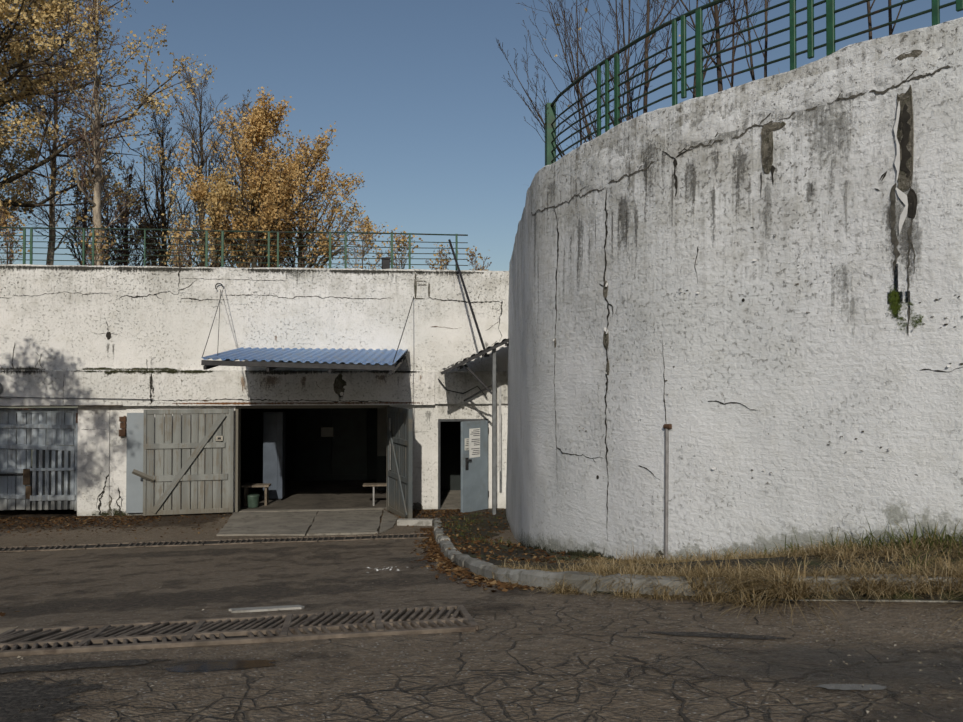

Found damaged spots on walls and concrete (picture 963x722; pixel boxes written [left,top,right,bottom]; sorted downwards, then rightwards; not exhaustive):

leakage [611,161,645,251]
leakage [641,142,666,200]
leakage [662,164,697,224]
leakage [733,146,751,212]
spalling [761,120,786,174]
spalling [896,85,918,235]
crack [0,266,386,301]
crack [429,297,503,345]
crack [531,60,953,557]
spalling [333,374,348,396]